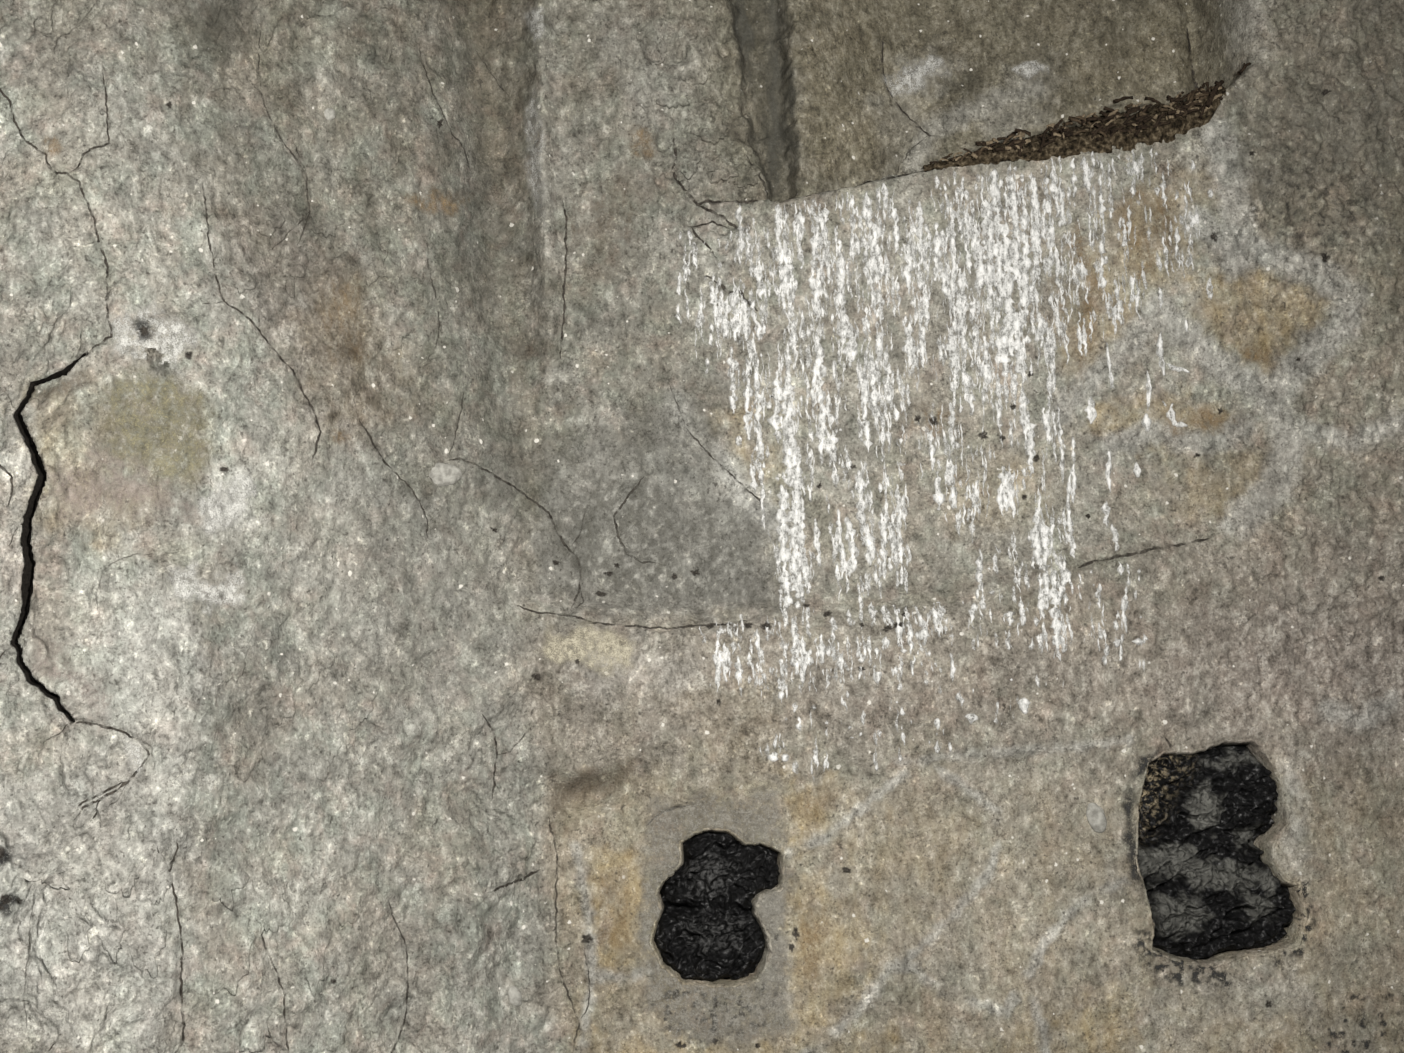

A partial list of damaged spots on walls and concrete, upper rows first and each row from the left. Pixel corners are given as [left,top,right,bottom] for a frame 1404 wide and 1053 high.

crack [0,74,150,820]
leakage [675,0,1213,779]
hole [649,827,799,1016]
hole [1135,739,1308,969]